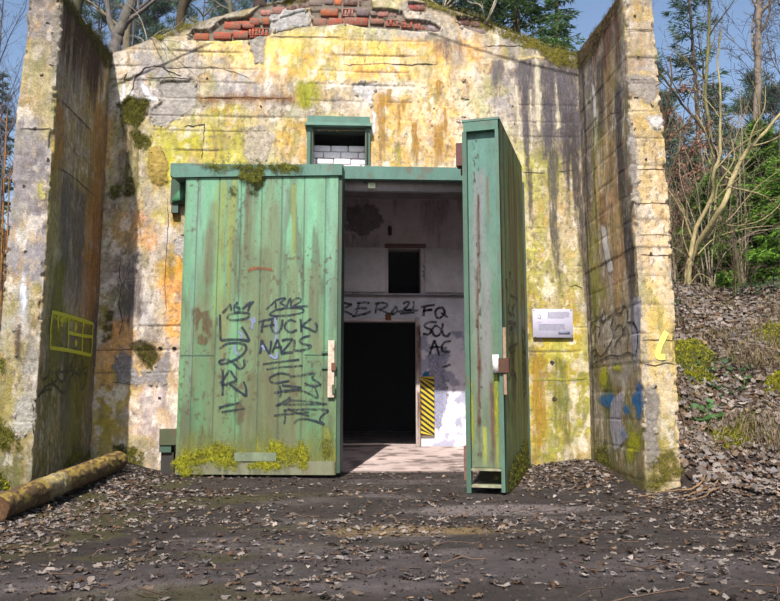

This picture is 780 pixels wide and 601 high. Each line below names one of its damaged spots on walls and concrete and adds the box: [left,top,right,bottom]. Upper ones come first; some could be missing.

rust [62,3,107,335]
crack [124,65,248,95]
spalling [187,0,443,65]
damp [493,60,504,84]
damp [513,54,628,452]
damp [615,85,641,363]